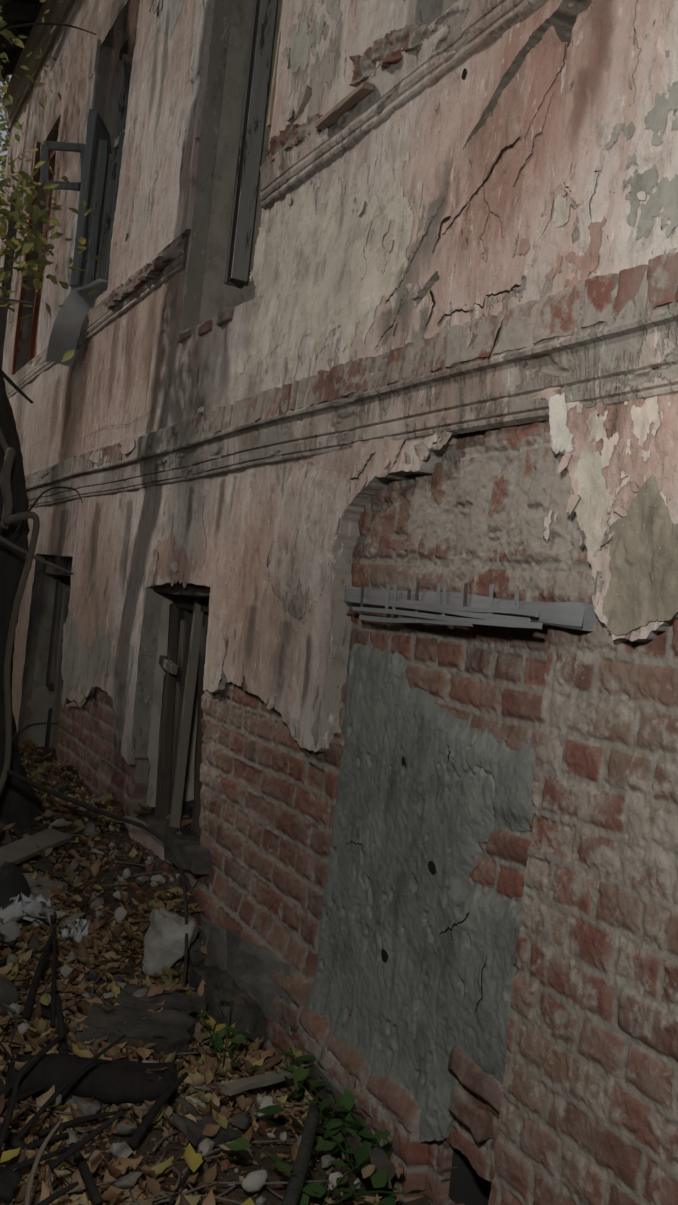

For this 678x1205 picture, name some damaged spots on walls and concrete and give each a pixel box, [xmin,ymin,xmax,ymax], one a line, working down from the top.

spalling [266,114,323,161]
spalling [349,23,429,87]
peeling [192,152,678,434]
crack [359,9,603,359]
peeling [605,80,678,150]
flaking render [56,607,150,817]
flaking render [192,674,346,1067]
flaking render [351,392,678,1205]